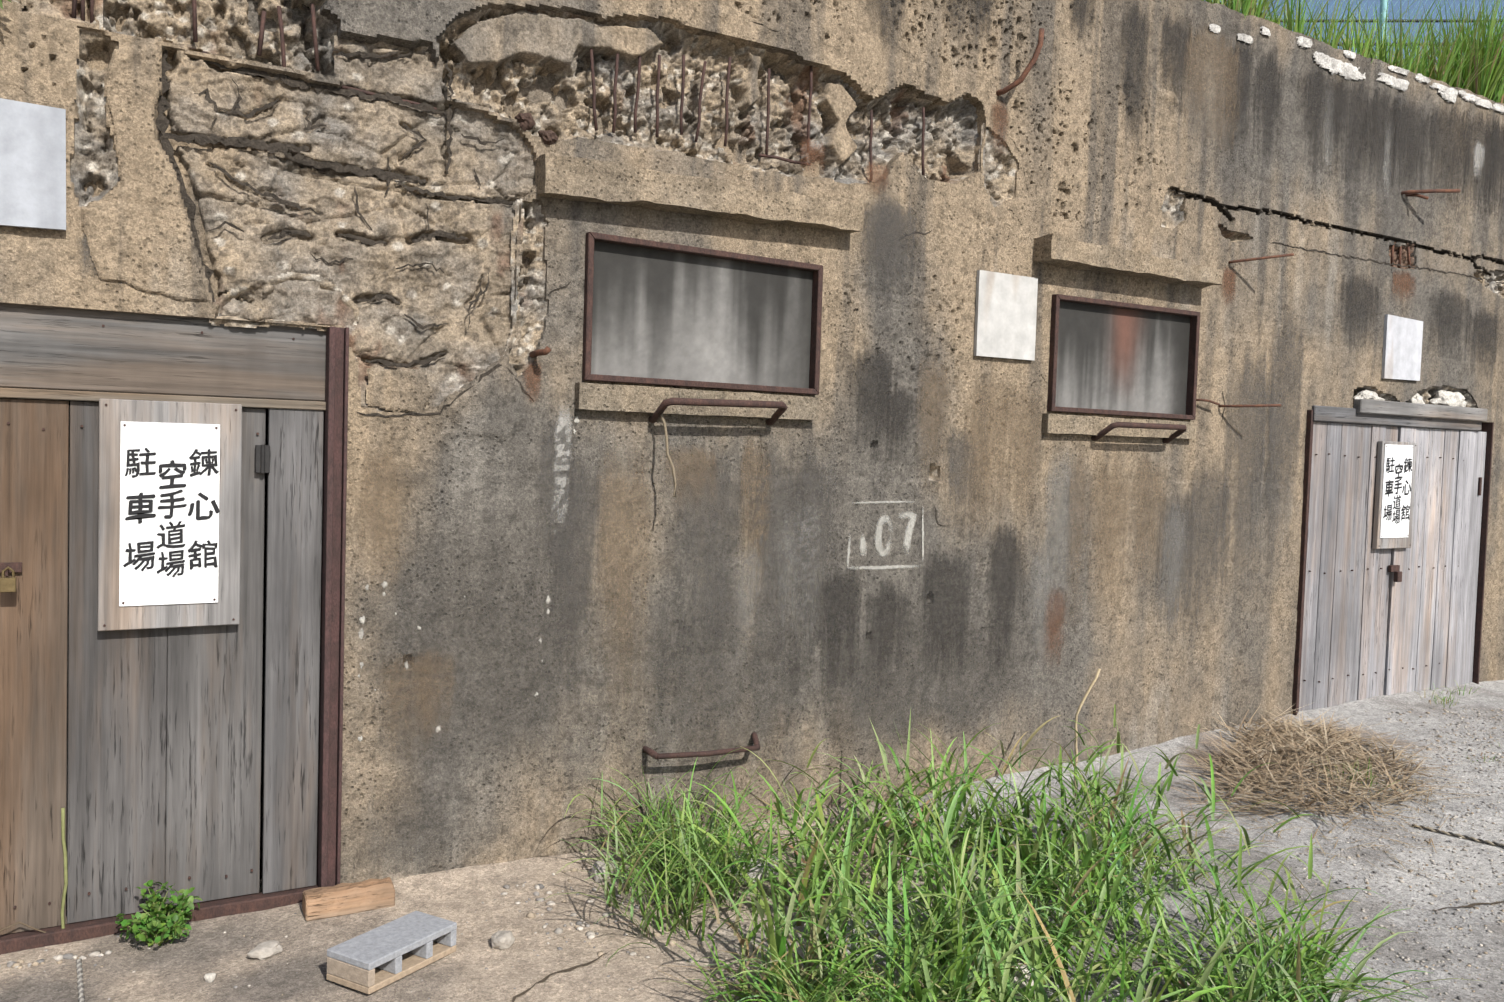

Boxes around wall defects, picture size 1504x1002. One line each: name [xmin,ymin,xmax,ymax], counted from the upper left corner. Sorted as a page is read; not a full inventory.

crack [156,49,215,303]
spalling [0,0,1185,495]
damp [1122,8,1197,132]
peeling [1209,24,1271,45]
crack [1170,188,1504,284]
peeling [1296,36,1504,114]
damp [1302,66,1504,205]
damp [541,416,612,626]
damp [679,452,906,672]
damp [1141,322,1302,611]
spalling [1353,386,1477,408]
damp [1437,293,1499,368]